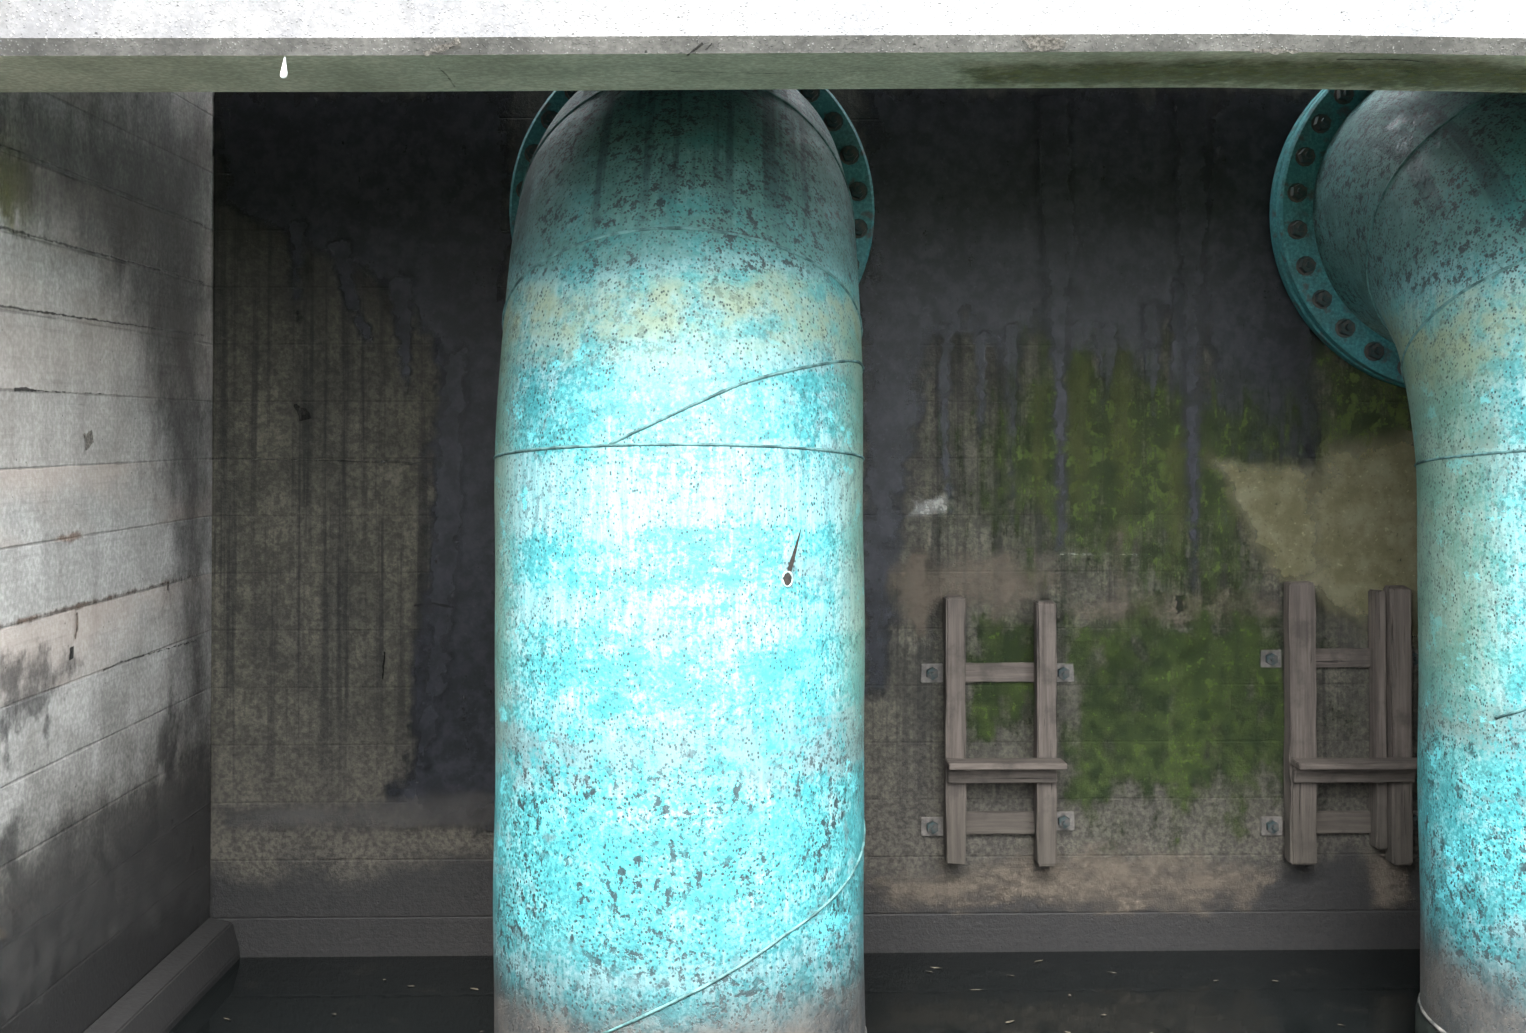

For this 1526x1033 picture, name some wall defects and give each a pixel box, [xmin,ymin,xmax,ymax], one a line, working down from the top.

leakage [0,91,514,1016]
leakage [858,88,1321,695]